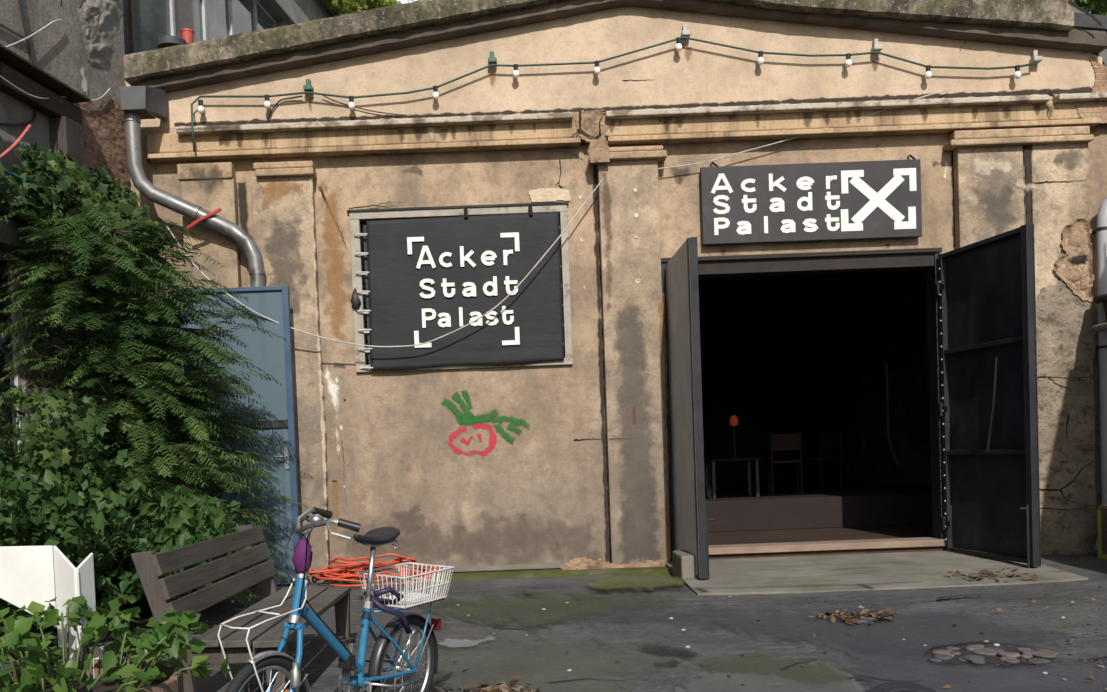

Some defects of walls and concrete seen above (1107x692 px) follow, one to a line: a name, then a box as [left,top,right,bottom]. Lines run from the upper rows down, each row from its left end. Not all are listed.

flaking render [1074,57,1107,123]
spalling [574,108,611,163]
spalling [1054,217,1094,302]
damp [593,165,670,563]
crack [1037,376,1090,389]
crack [1039,461,1094,511]